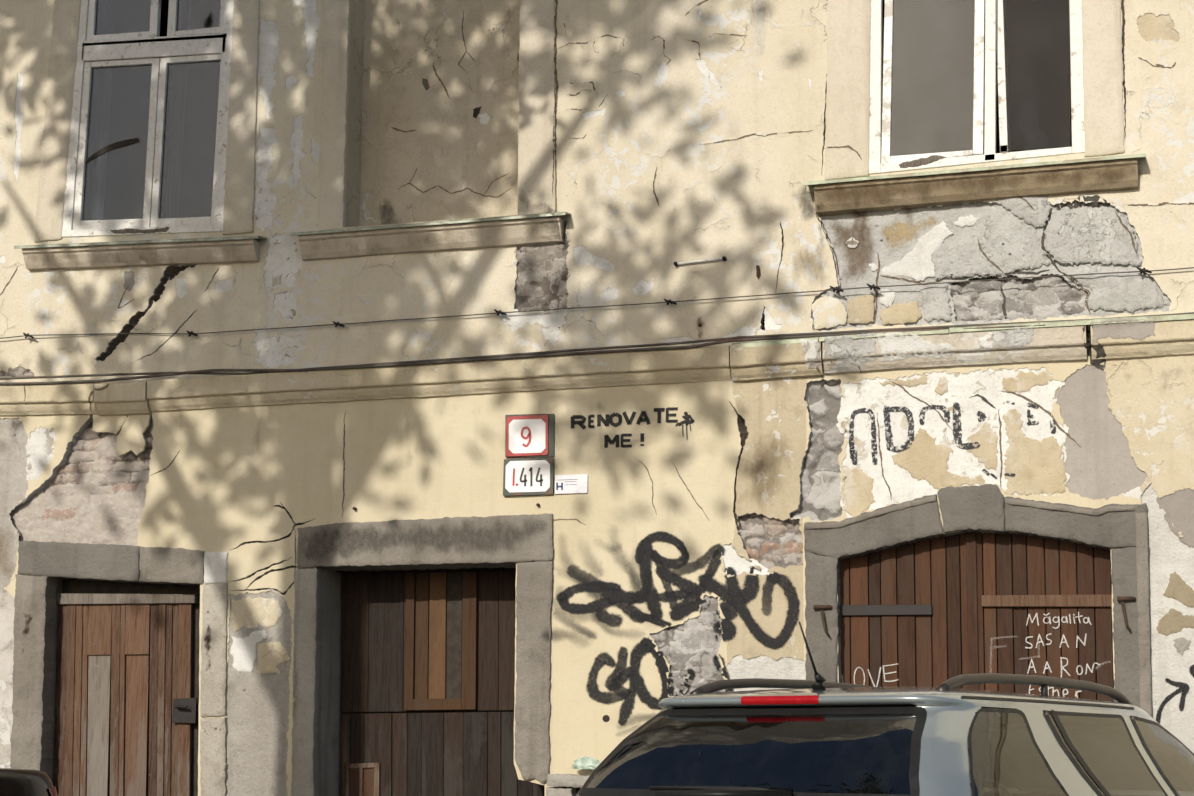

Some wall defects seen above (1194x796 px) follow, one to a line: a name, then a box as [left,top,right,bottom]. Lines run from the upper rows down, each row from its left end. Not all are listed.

peeling [254,17,307,319]
crack [552,0,624,193]
crack [652,168,660,205]
crack [1121,0,1176,136]
crack [88,266,195,413]
flaking render [499,220,615,347]
flaking render [0,414,154,588]
crack [233,505,312,595]
crack [640,403,748,527]
peeling [721,203,1194,753]
peeling [226,589,293,796]
flaking render [650,594,806,697]